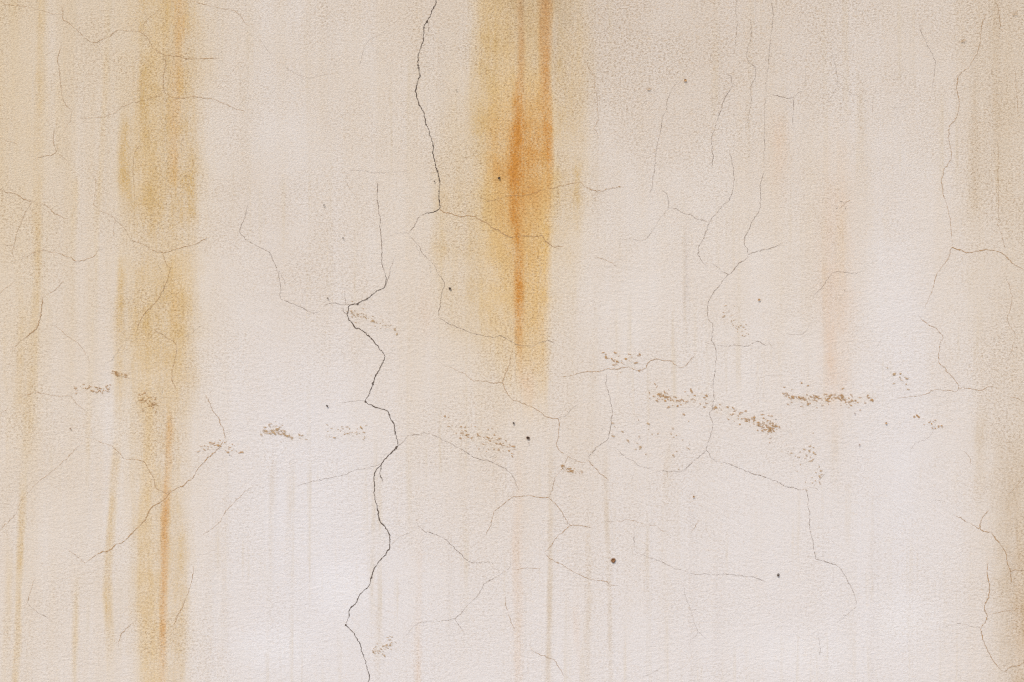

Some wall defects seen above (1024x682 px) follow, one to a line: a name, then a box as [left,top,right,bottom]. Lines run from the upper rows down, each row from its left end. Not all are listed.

crack [92,400,224,558]
rust [80,0,250,682]
crack [329,184,417,681]
crack [411,3,559,252]
rust [436,0,575,469]
crack [959,512,1023,667]